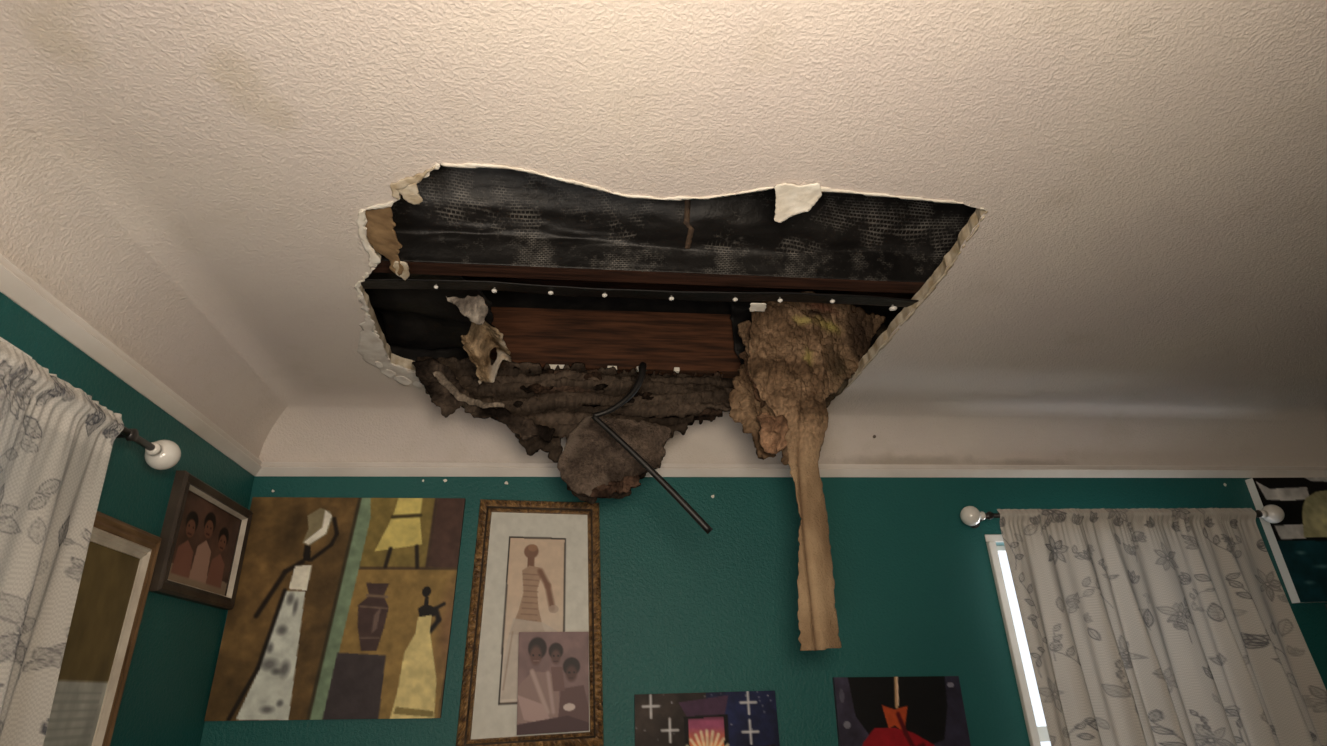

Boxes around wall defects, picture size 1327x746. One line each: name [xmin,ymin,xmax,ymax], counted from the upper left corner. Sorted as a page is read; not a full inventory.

peeling [390,165,436,205]
flaking render [774,182,822,223]
peeling [356,210,381,267]
peeling [357,293,424,389]